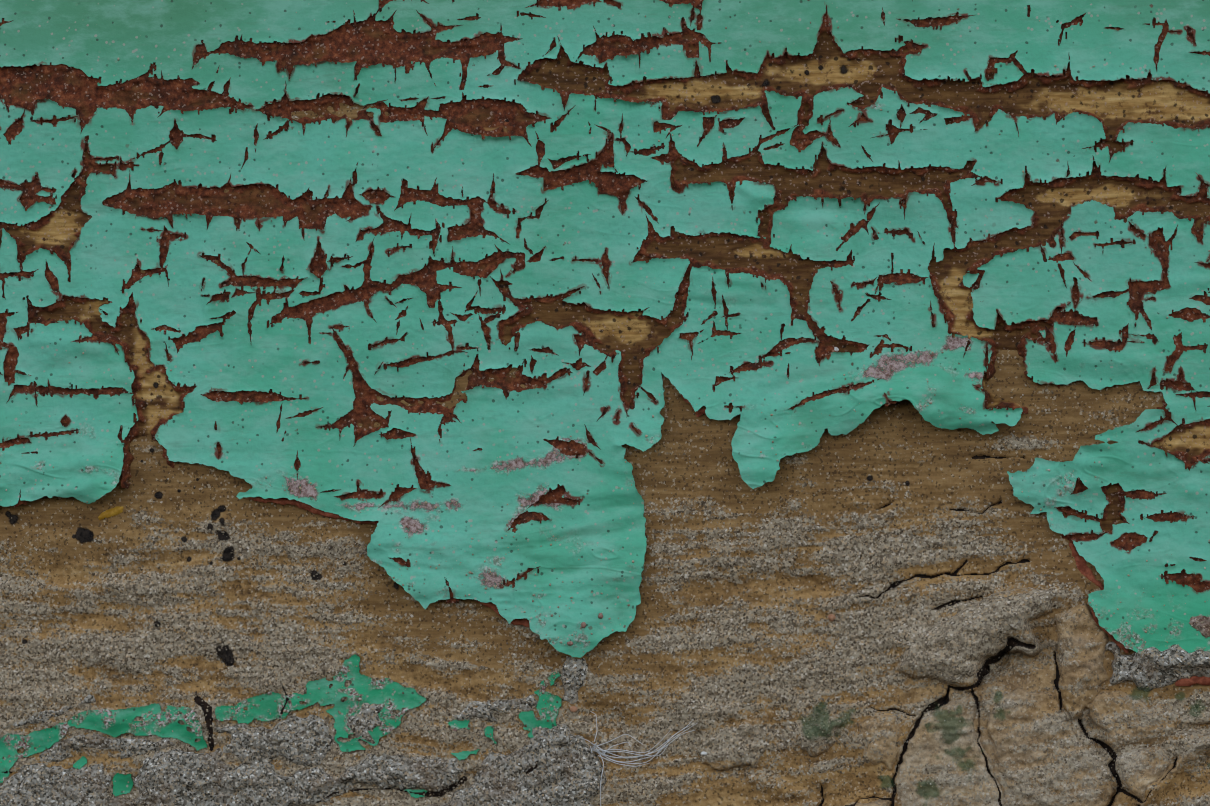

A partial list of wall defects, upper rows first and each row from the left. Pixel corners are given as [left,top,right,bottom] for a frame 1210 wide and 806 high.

peeling [0,390,138,507]
peeling [695,351,1023,489]
peeling [220,446,647,658]
crack [856,559,1030,610]
peeling [1007,446,1210,654]
crack [818,637,1177,806]